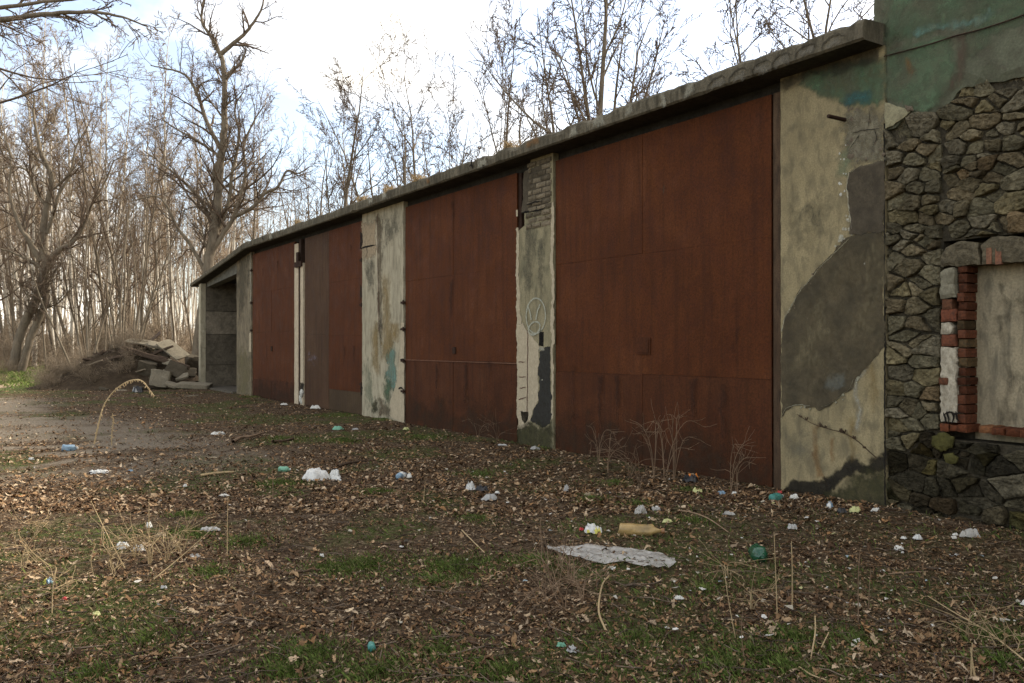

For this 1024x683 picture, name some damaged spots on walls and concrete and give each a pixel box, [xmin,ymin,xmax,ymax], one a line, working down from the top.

damp [366,214,397,339]
peeling [515,156,555,430]
spalling [780,102,914,416]